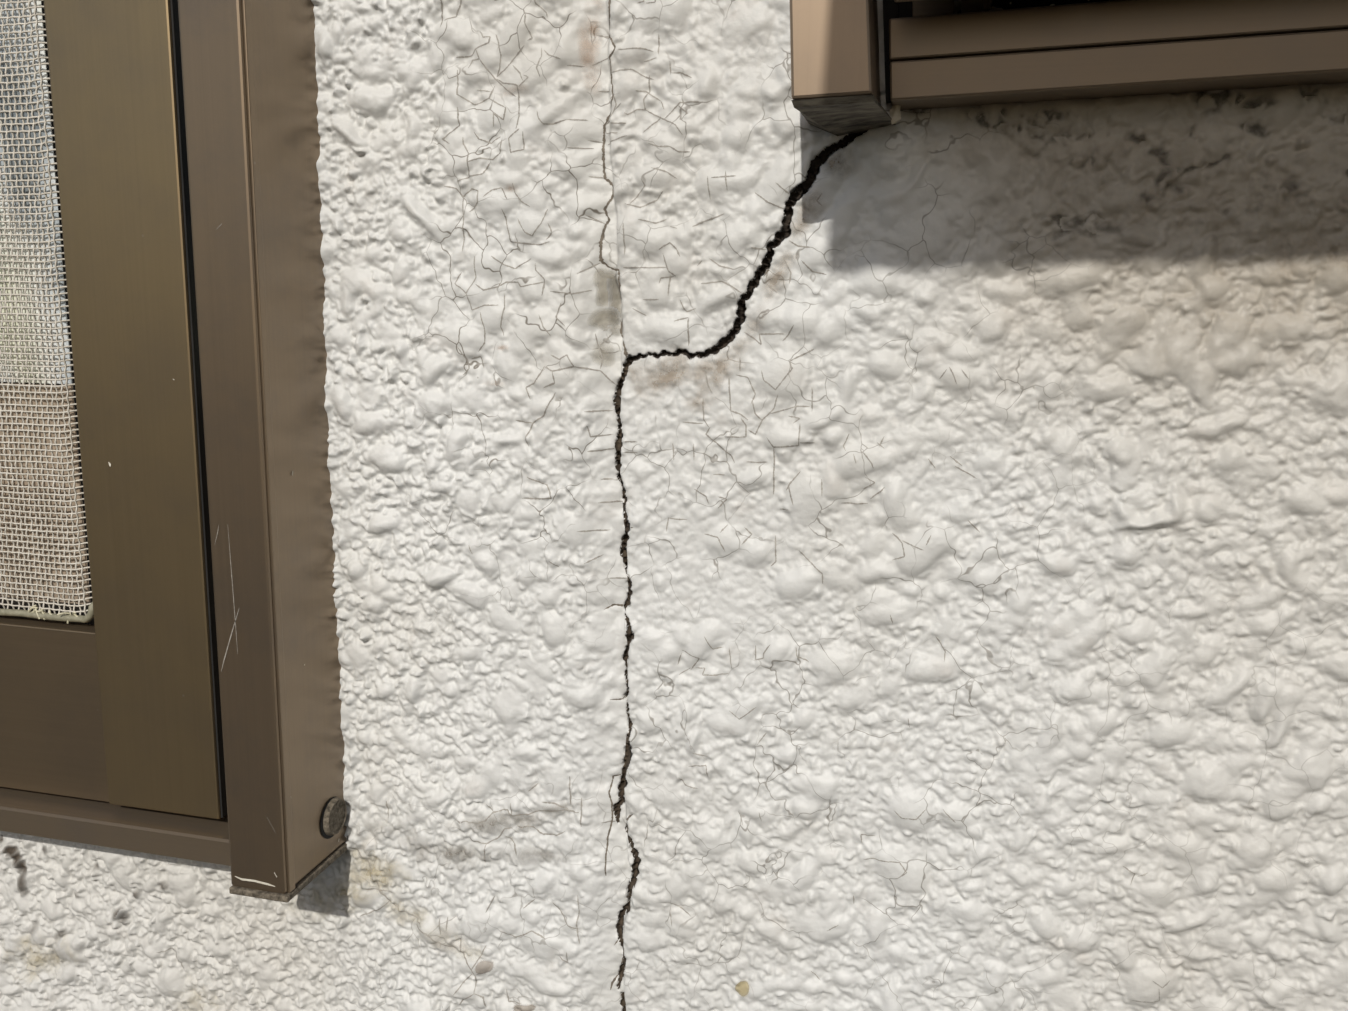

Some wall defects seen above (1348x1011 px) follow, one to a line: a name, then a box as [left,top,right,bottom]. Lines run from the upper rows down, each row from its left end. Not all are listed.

crack [928,456,977,479]
crack [440,0,885,1011]
crack [893,534,931,560]
crack [860,809,955,878]
crack [351,848,580,1006]